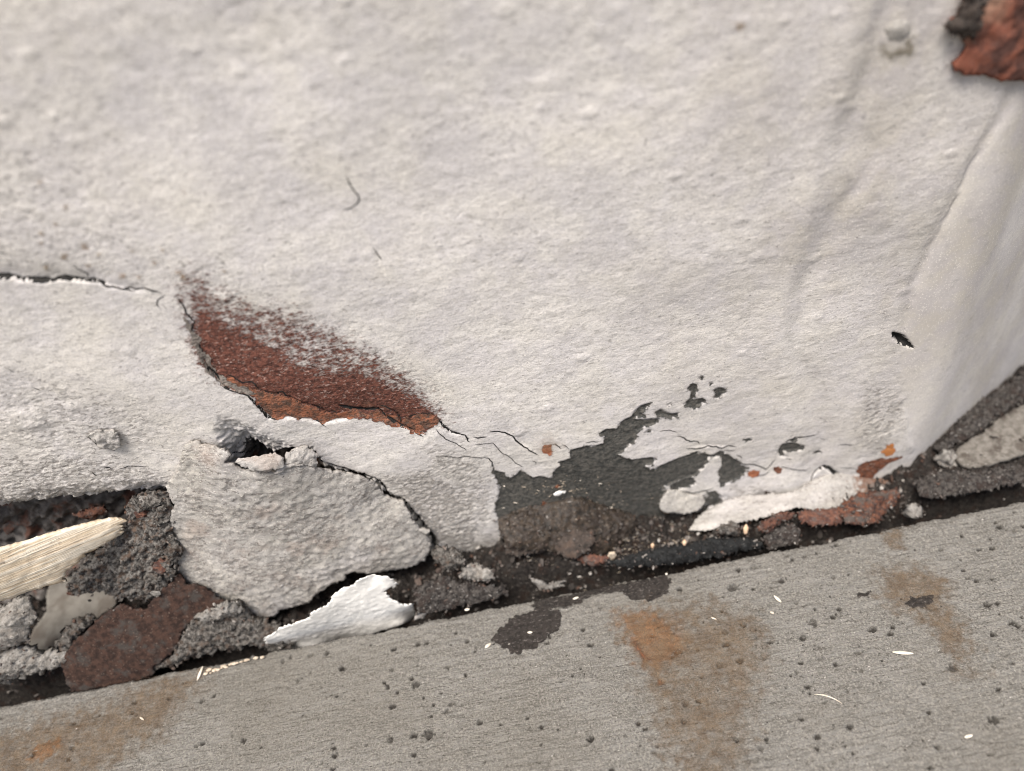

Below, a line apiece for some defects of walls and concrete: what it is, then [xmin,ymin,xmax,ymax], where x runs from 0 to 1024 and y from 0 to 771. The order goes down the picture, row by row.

rust [942,0,989,41]
crack [0,252,600,467]
rust [172,271,444,435]
spalling [892,332,915,349]
crack [314,451,437,546]
peeling [491,376,750,518]
peeling [778,437,822,460]
rust [757,507,845,550]
rust [856,444,902,478]
rust [624,611,761,754]